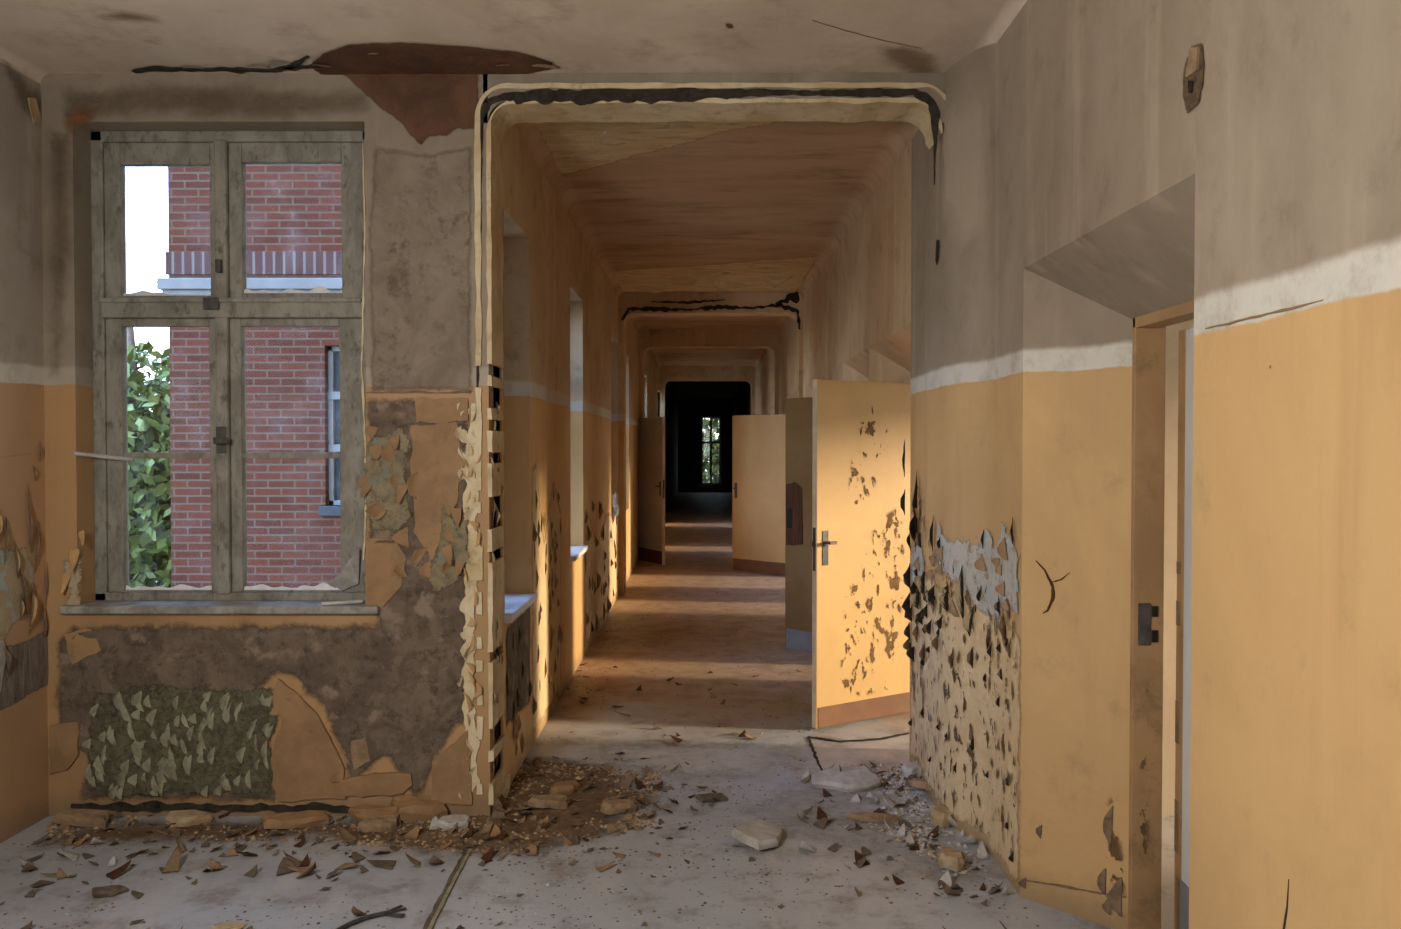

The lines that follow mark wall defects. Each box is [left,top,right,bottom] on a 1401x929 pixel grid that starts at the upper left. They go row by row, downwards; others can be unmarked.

hole [1183,44,1204,113]
spalling [0,43,563,805]
spalling [849,407,887,505]
peeling [585,491,620,646]
peeling [841,441,1026,889]
peeling [1097,801,1124,917]